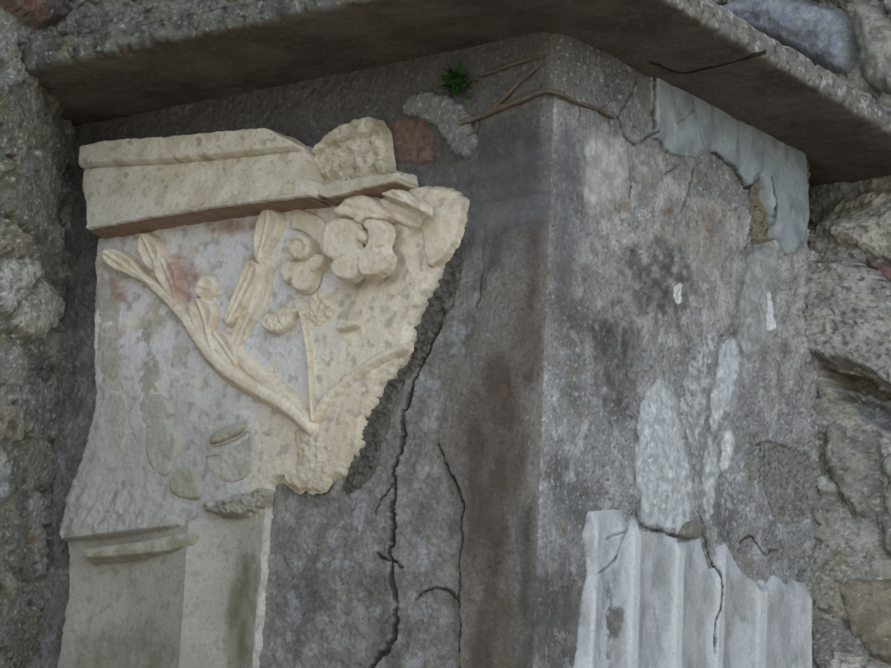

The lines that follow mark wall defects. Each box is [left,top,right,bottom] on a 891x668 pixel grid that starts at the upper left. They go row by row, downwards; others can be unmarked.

crack [617,49,766,173]
crack [712,152,751,207]
spalling [341,248,463,495]
crack [370,313,445,668]
crack [419,444,465,668]
crack [639,523,724,647]
crack [739,536,774,556]